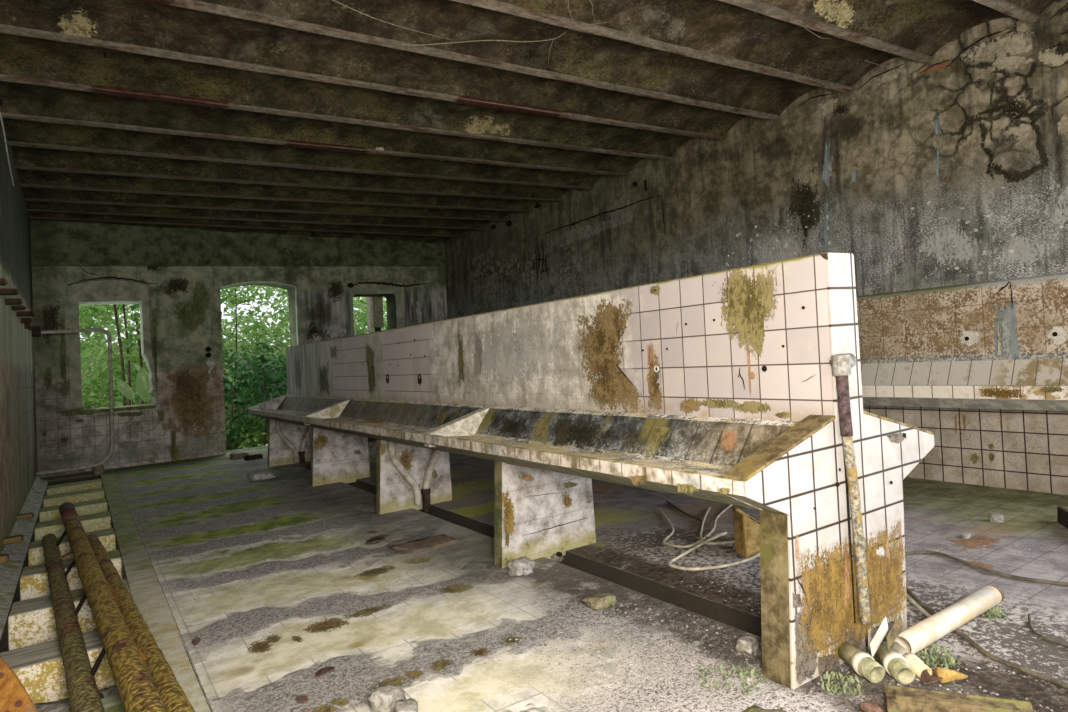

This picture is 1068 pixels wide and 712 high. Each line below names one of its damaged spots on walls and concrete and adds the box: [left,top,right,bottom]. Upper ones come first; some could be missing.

water stain [946,0,1002,19]
water stain [510,44,550,70]
crack [949,27,1011,66]
crack [797,64,904,107]
flaking render [1006,123,1032,140]
flaking render [1057,114,1068,135]
water stain [779,104,862,252]
water stain [40,301,67,391]
water stain [607,302,623,347]
water stain [755,295,765,350]
water stain [152,314,213,461]